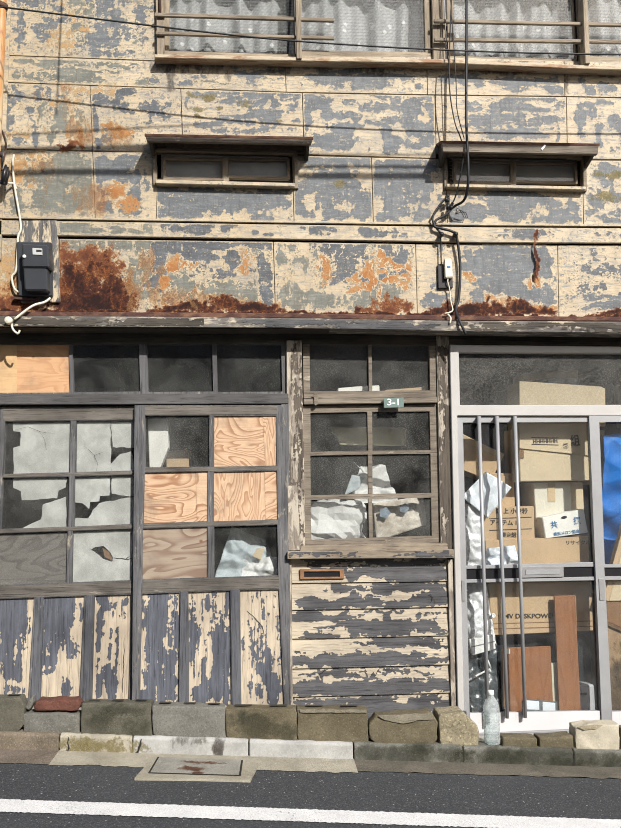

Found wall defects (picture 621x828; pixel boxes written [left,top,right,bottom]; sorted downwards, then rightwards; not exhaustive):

peeling [0,0,621,332]
corrosion [0,241,558,316]
corrosion [527,229,542,290]
corrosion [569,307,621,317]
peeling [289,343,454,723]
peeling [0,598,31,694]
peeling [42,596,84,696]
peeling [95,595,129,699]
peeling [140,591,231,705]
peeling [241,590,283,705]